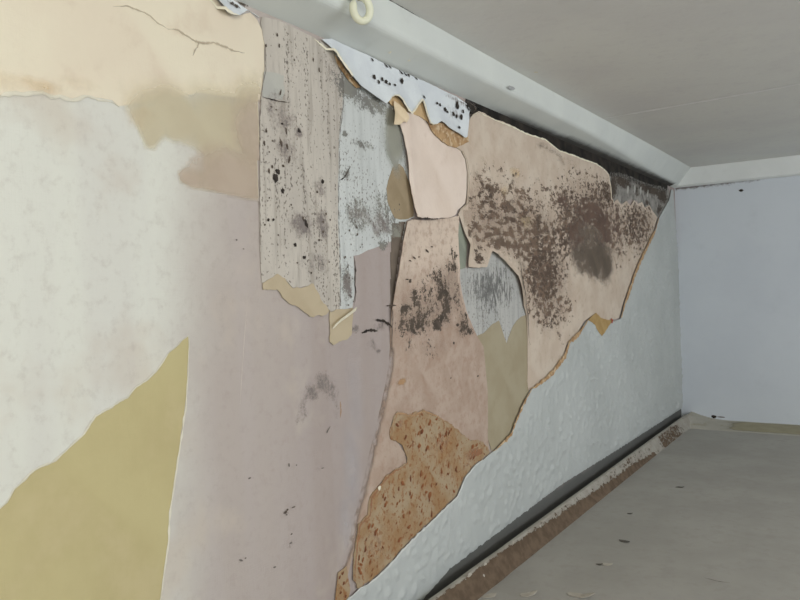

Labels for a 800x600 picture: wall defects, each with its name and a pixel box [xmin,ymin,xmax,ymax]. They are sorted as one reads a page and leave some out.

crack [121,5,242,55]
water stain [131,88,291,198]
water stain [293,213,331,241]
flaking render [259,17,414,345]
water stain [345,204,474,359]
peeling [458,223,530,451]
water stain [436,98,744,340]
flaking render [610,172,669,217]
peeling [0,336,190,600]
corrosion [335,409,490,600]
peeling [435,425,683,600]